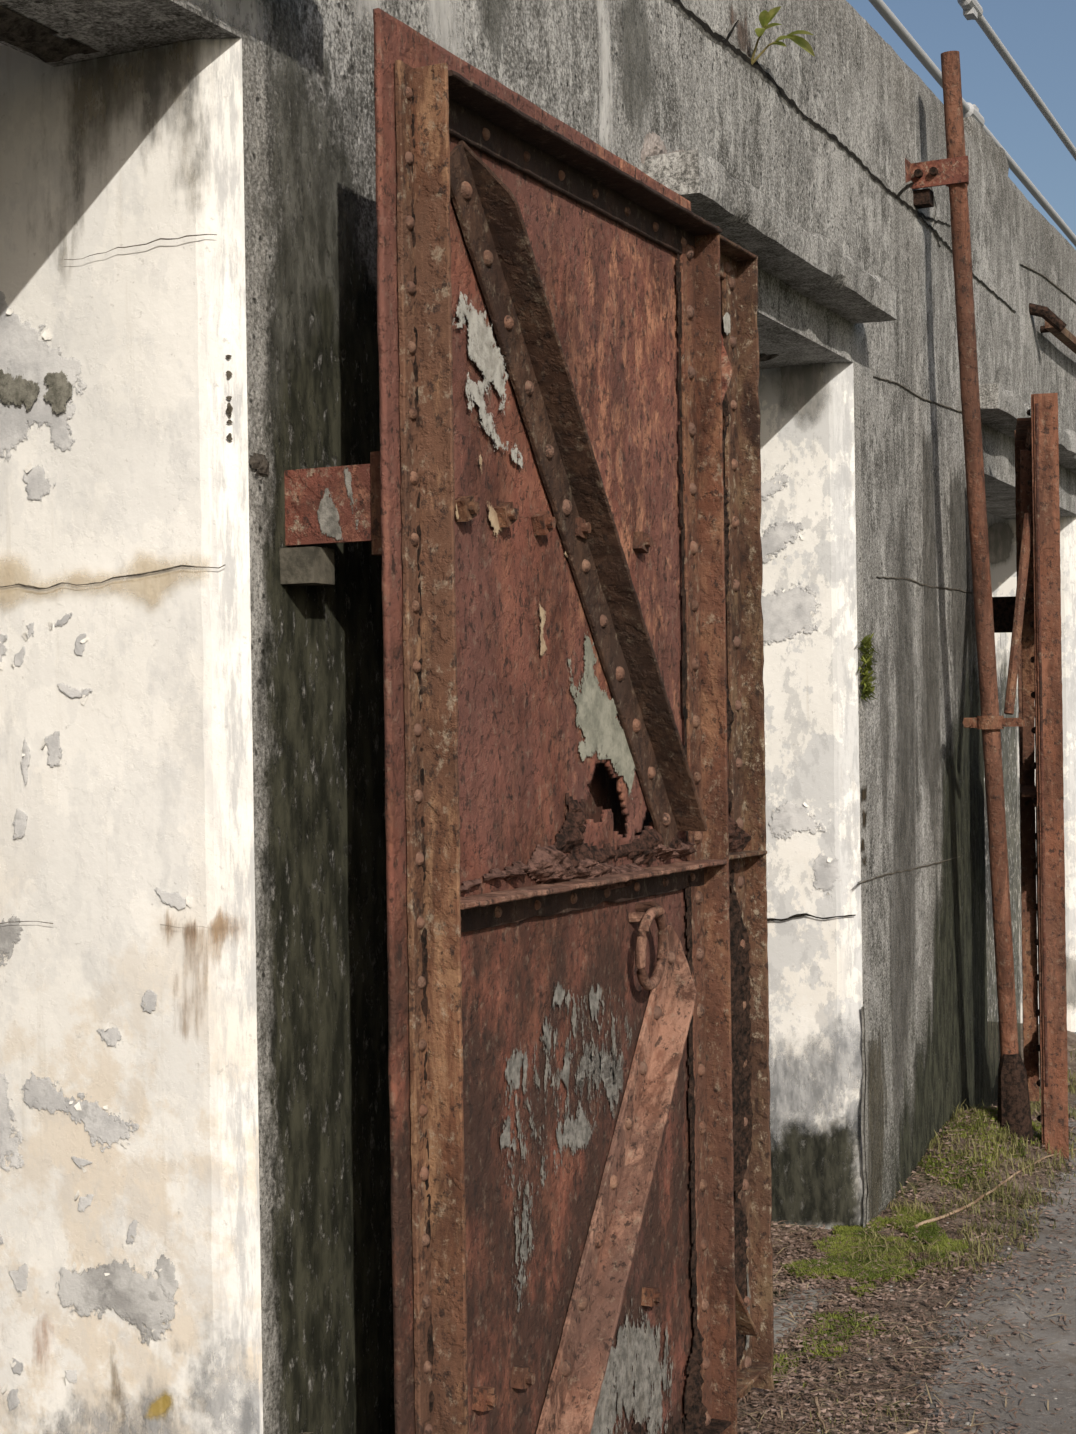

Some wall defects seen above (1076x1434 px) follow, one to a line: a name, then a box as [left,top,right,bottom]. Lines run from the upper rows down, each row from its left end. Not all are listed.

crack [665,0,1016,314]
crack [1020,263,1076,304]
peeling [0,291,87,501]
leakage [0,558,187,603]
crack [0,565,225,590]
peeling [761,582,821,646]
leakage [188,0,395,1434]
crack [767,856,960,921]
leakage [769,435,1001,1228]
leakage [997,635,1023,1055]
peeling [0,1071,139,1173]
peeling [46,1220,180,1345]